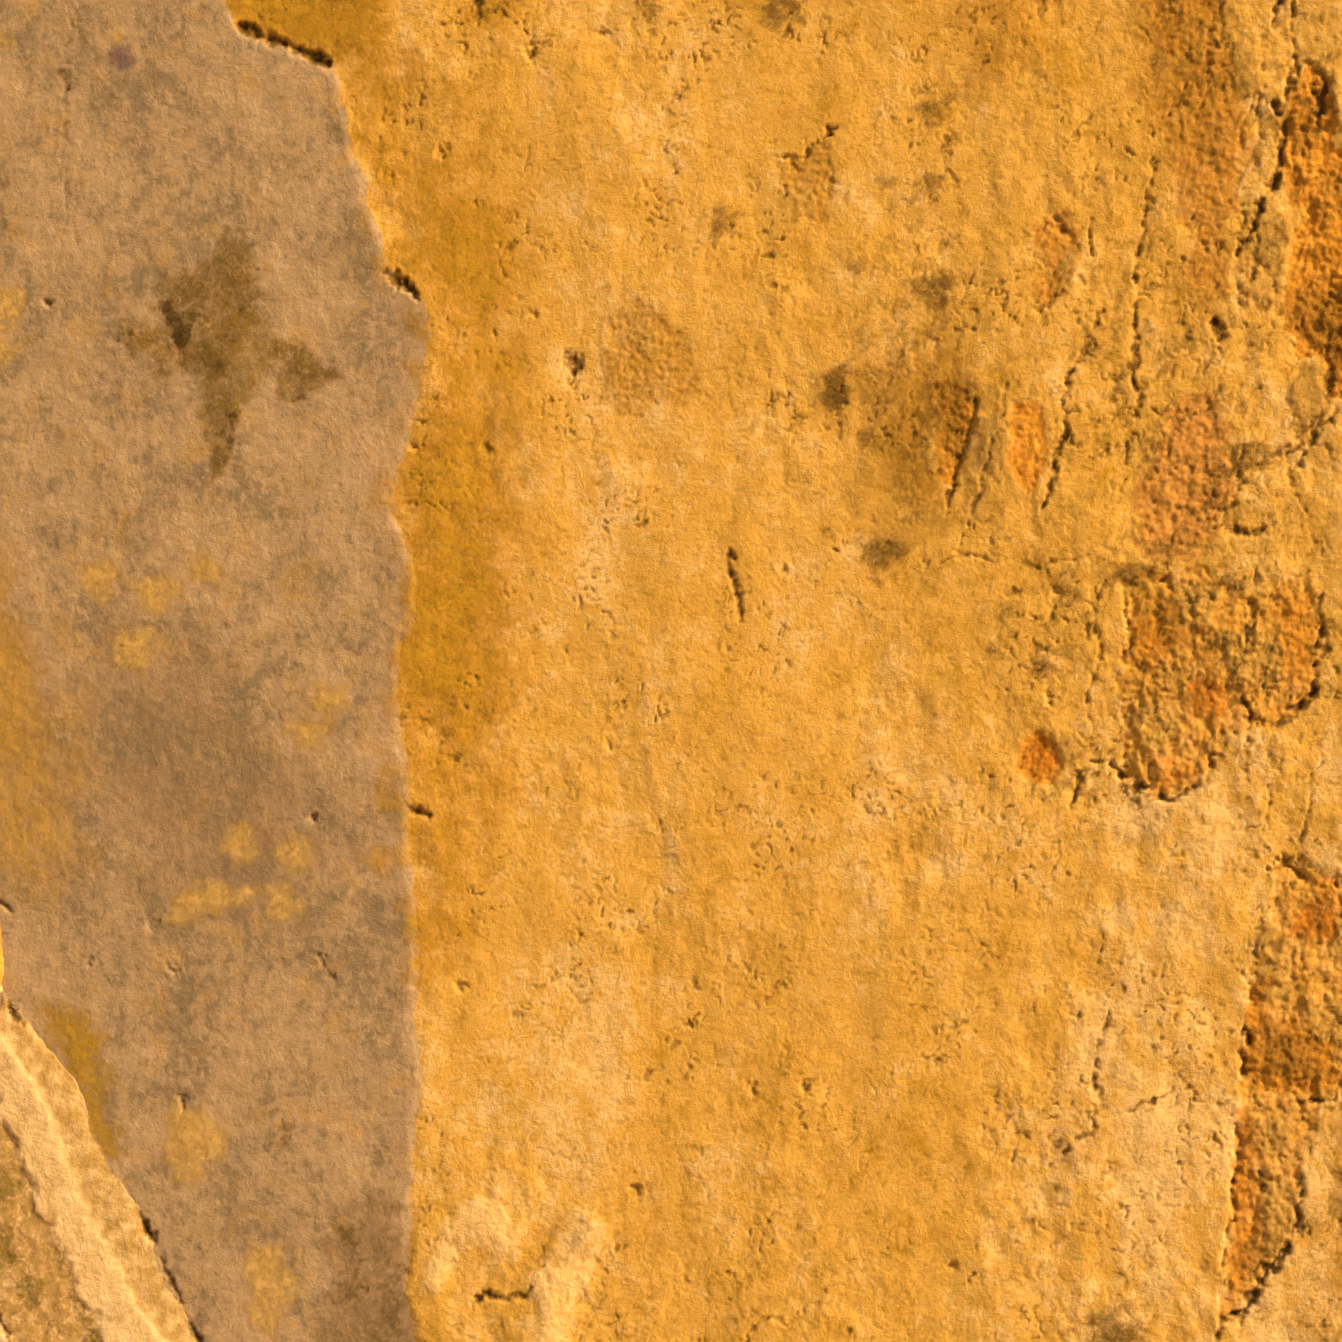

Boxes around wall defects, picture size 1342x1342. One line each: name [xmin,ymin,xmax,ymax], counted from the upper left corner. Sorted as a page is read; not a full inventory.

crack [1271,0,1293,26]
crack [1235,55,1328,281]
water stain [118,238,343,476]
crack [8,1001,25,1027]
spalling [0,1128,103,1342]
crack [142,1220,202,1342]